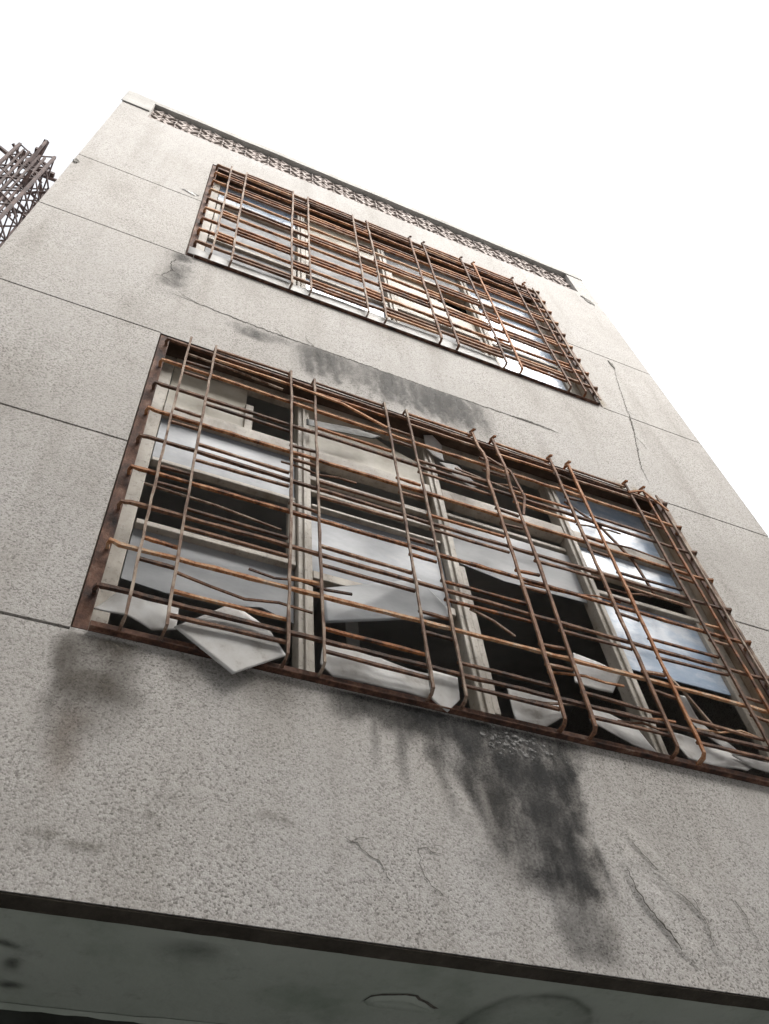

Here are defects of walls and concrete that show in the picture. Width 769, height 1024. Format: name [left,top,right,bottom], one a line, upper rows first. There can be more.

crack [156,259,558,433]
water stain [302,347,487,428]
crack [614,368,647,479]
water stain [55,636,134,700]
crack [347,837,390,880]
water stain [333,690,609,955]